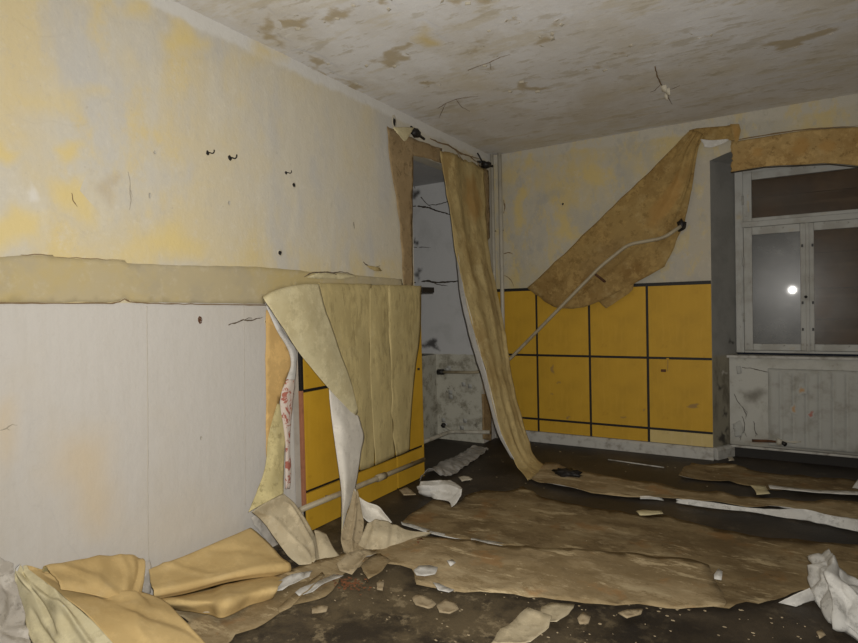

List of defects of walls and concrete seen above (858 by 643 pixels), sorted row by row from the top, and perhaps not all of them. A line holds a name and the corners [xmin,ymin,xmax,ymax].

crack [652,66,676,104]
crack [733,394,757,439]